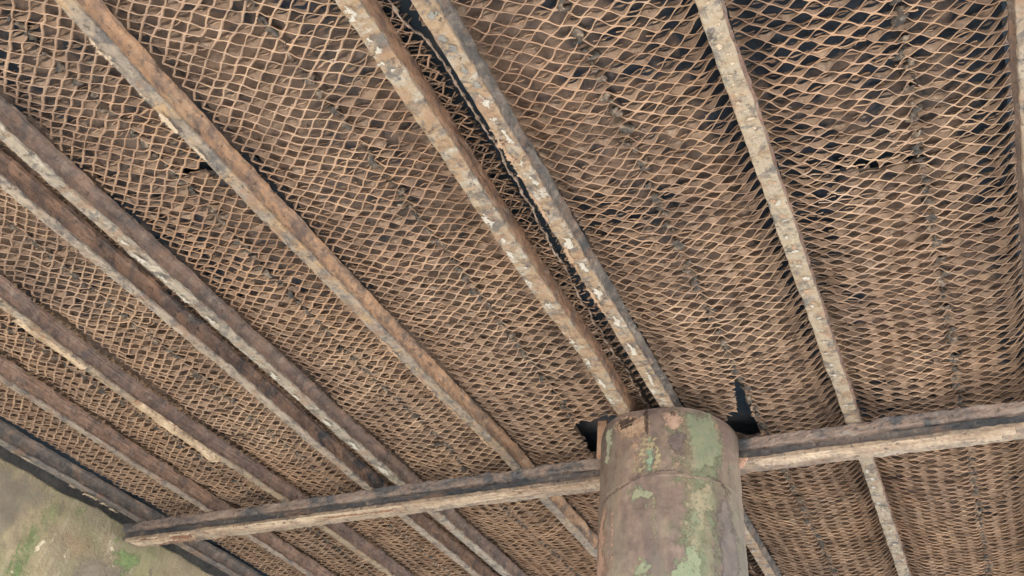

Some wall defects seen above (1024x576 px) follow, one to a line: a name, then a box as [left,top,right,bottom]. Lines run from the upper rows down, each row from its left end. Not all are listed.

corrosion [615,415,646,464]
corrosion [662,410,686,466]
peeling [626,411,731,576]
corrosion [597,508,614,576]